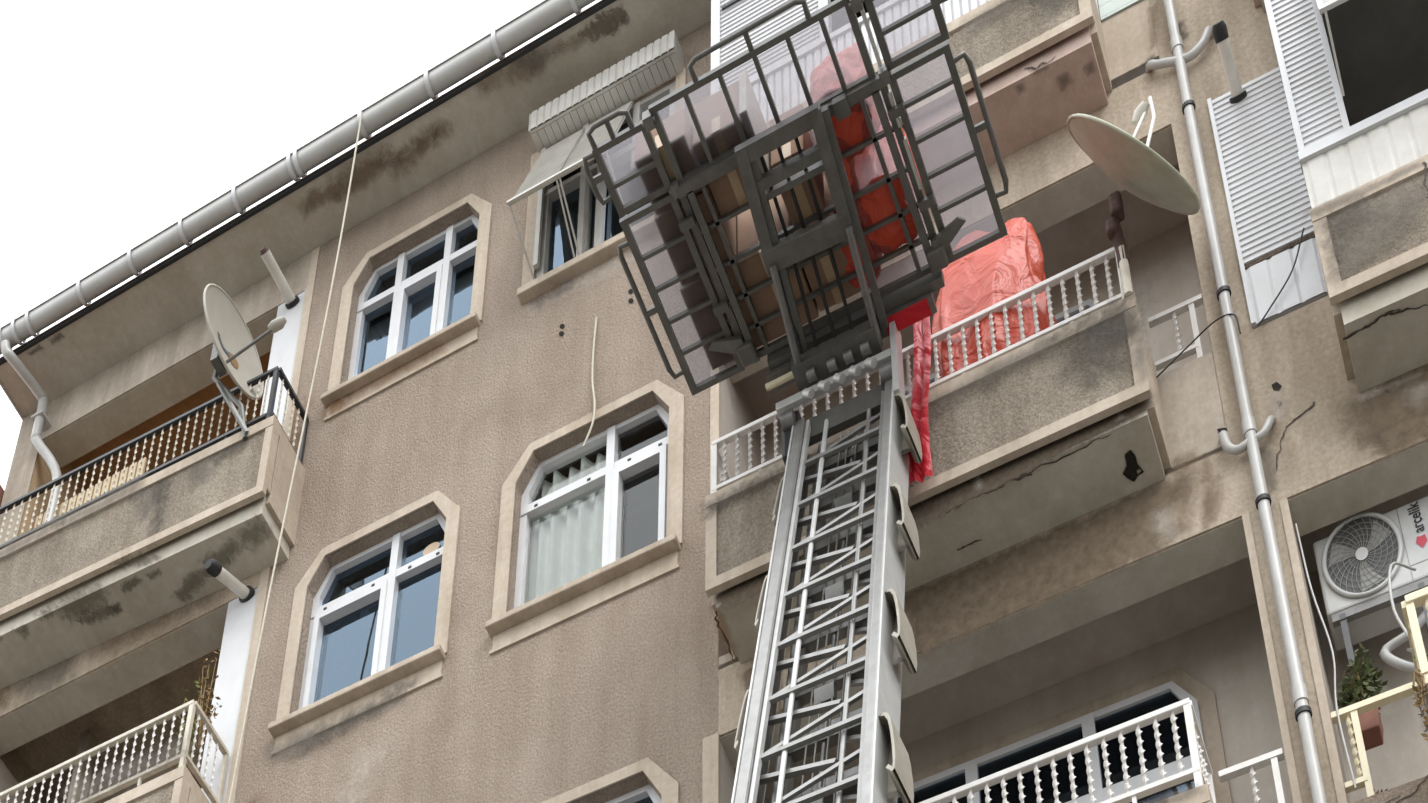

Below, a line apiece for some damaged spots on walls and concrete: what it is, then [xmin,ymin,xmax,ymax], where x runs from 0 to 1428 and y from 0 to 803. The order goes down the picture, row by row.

crack [1343,304,1428,340]
crack [946,434,1111,513]
spalling [909,393,1153,529]
crack [1276,401,1315,470]
spalling [716,570,769,609]